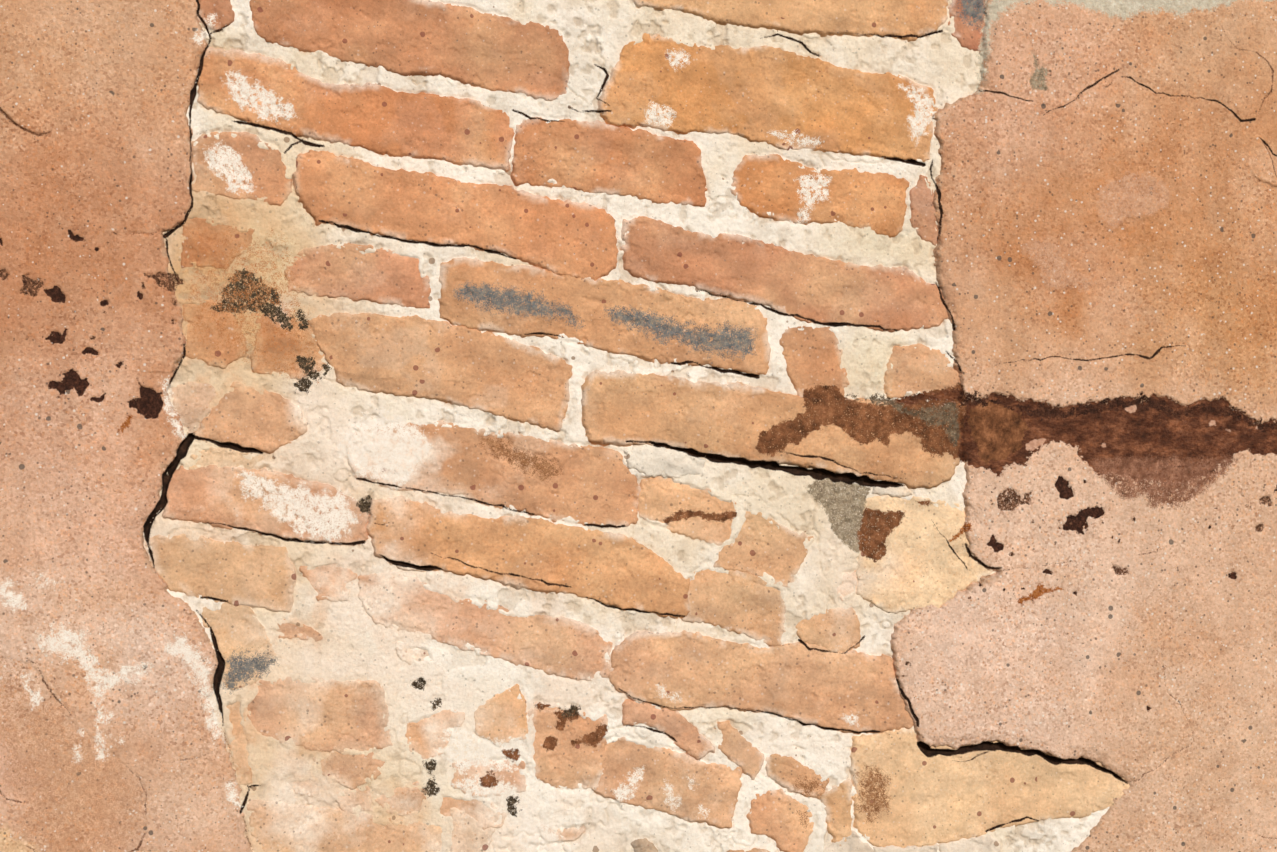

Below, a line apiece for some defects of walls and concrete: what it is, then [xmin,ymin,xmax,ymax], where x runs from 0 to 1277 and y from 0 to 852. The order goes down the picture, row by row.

flaking render [973,0,1275,95]
crack [980,69,1277,156]
damp [210,268,309,332]
damp [293,355,332,394]
crack [999,345,1186,364]
spalling [474,429,564,482]
damp [755,383,967,459]
crack [143,433,263,568]
spalling [985,535,1014,557]
crack [126,596,232,852]
crack [896,617,1194,784]
crack [240,785,261,850]